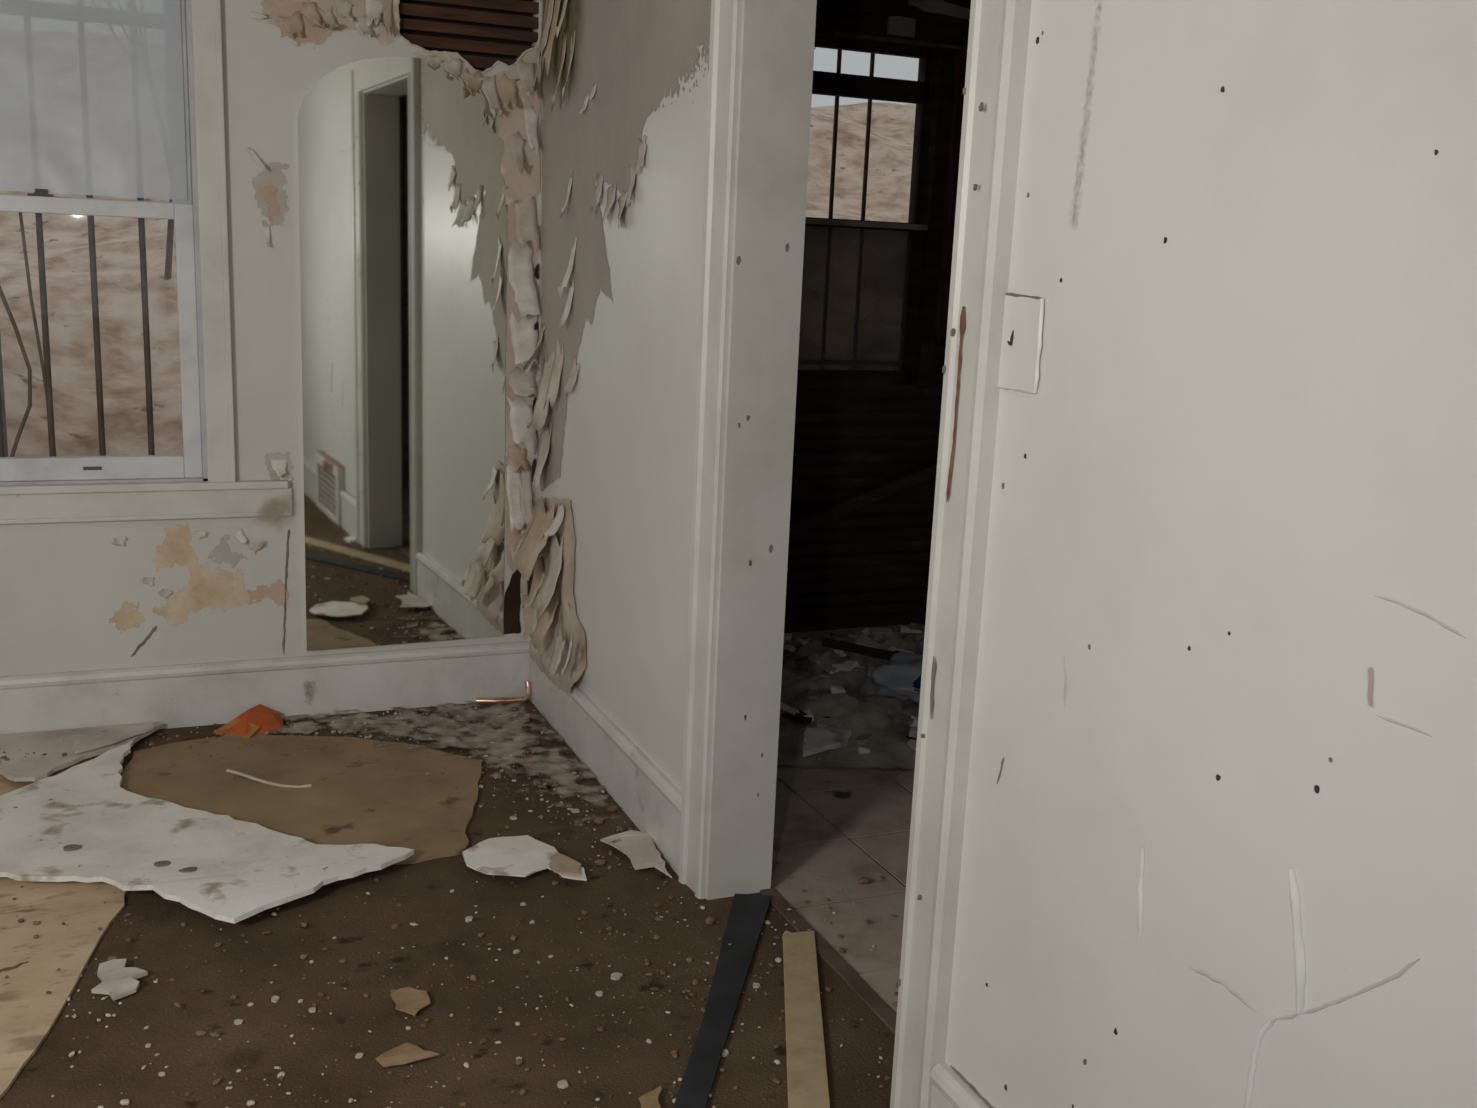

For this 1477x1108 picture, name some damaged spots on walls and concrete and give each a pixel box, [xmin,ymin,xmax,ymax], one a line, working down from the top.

peeling [245,0,711,640]
peeling [108,524,290,633]
crack [1190,868,1420,1108]